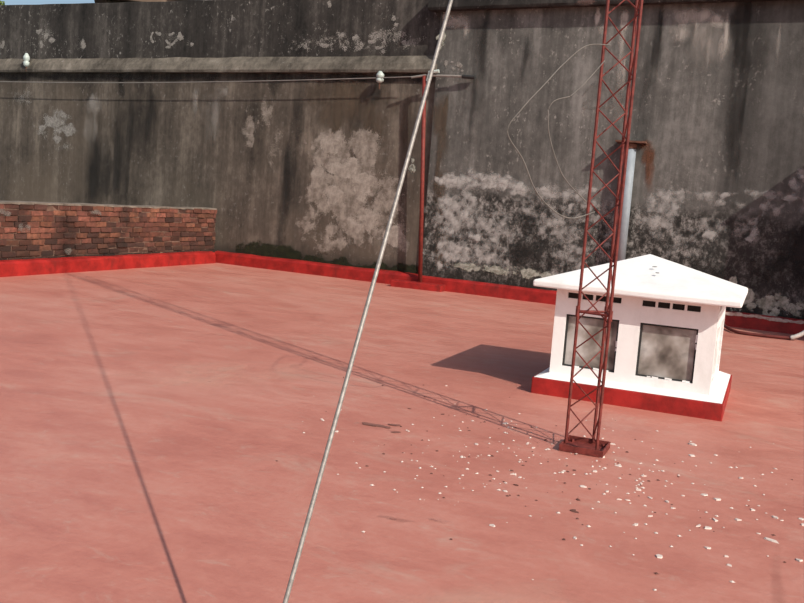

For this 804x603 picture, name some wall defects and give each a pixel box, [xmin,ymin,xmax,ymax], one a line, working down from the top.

water stain [82,72,132,92]
water stain [383,73,422,82]
rust [642,142,654,184]
water stain [423,98,615,270]
water stain [637,187,685,237]
water stain [697,191,729,205]
water stain [740,191,795,215]
water stain [689,218,723,240]
water stain [699,269,724,278]